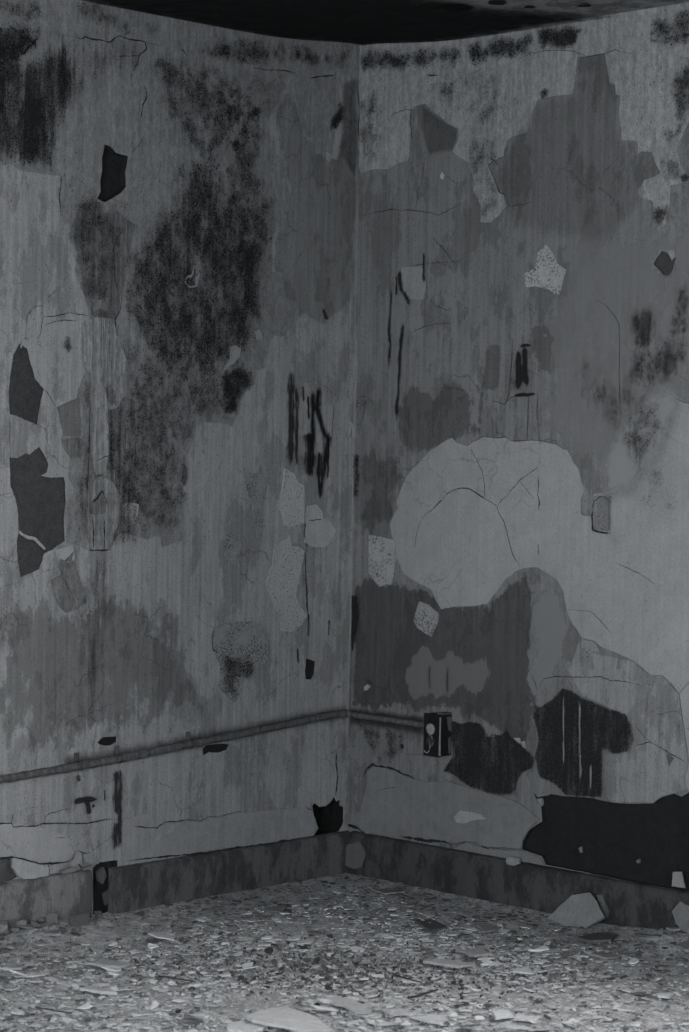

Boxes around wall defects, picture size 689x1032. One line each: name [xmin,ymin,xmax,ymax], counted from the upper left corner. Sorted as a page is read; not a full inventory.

water stain [651,10,689,46]
water stain [661,57,689,182]
water stain [0,0,597,544]
peeling [0,0,689,632]
crack [414,339,563,564]
water stain [582,289,689,471]
flaking render [360,393,689,892]
crack [0,808,107,871]
crack [136,810,247,829]
crack [128,836,311,861]
peeling [0,754,689,1032]